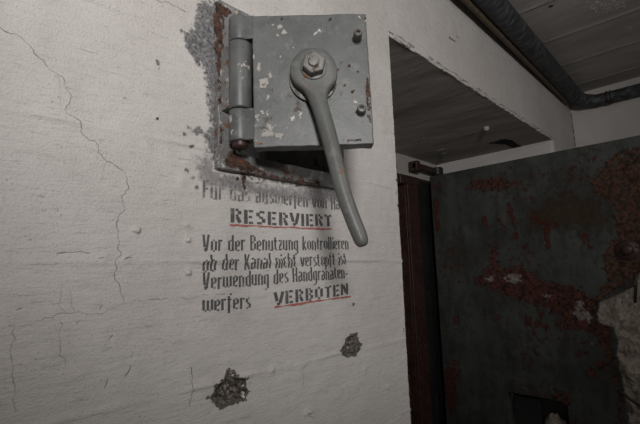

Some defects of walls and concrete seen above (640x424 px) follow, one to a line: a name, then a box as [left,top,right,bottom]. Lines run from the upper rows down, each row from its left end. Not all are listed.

rust [213,1,232,104]
rust [472,244,613,344]
spalling [206,368,250,410]
spalling [340,332,362,358]